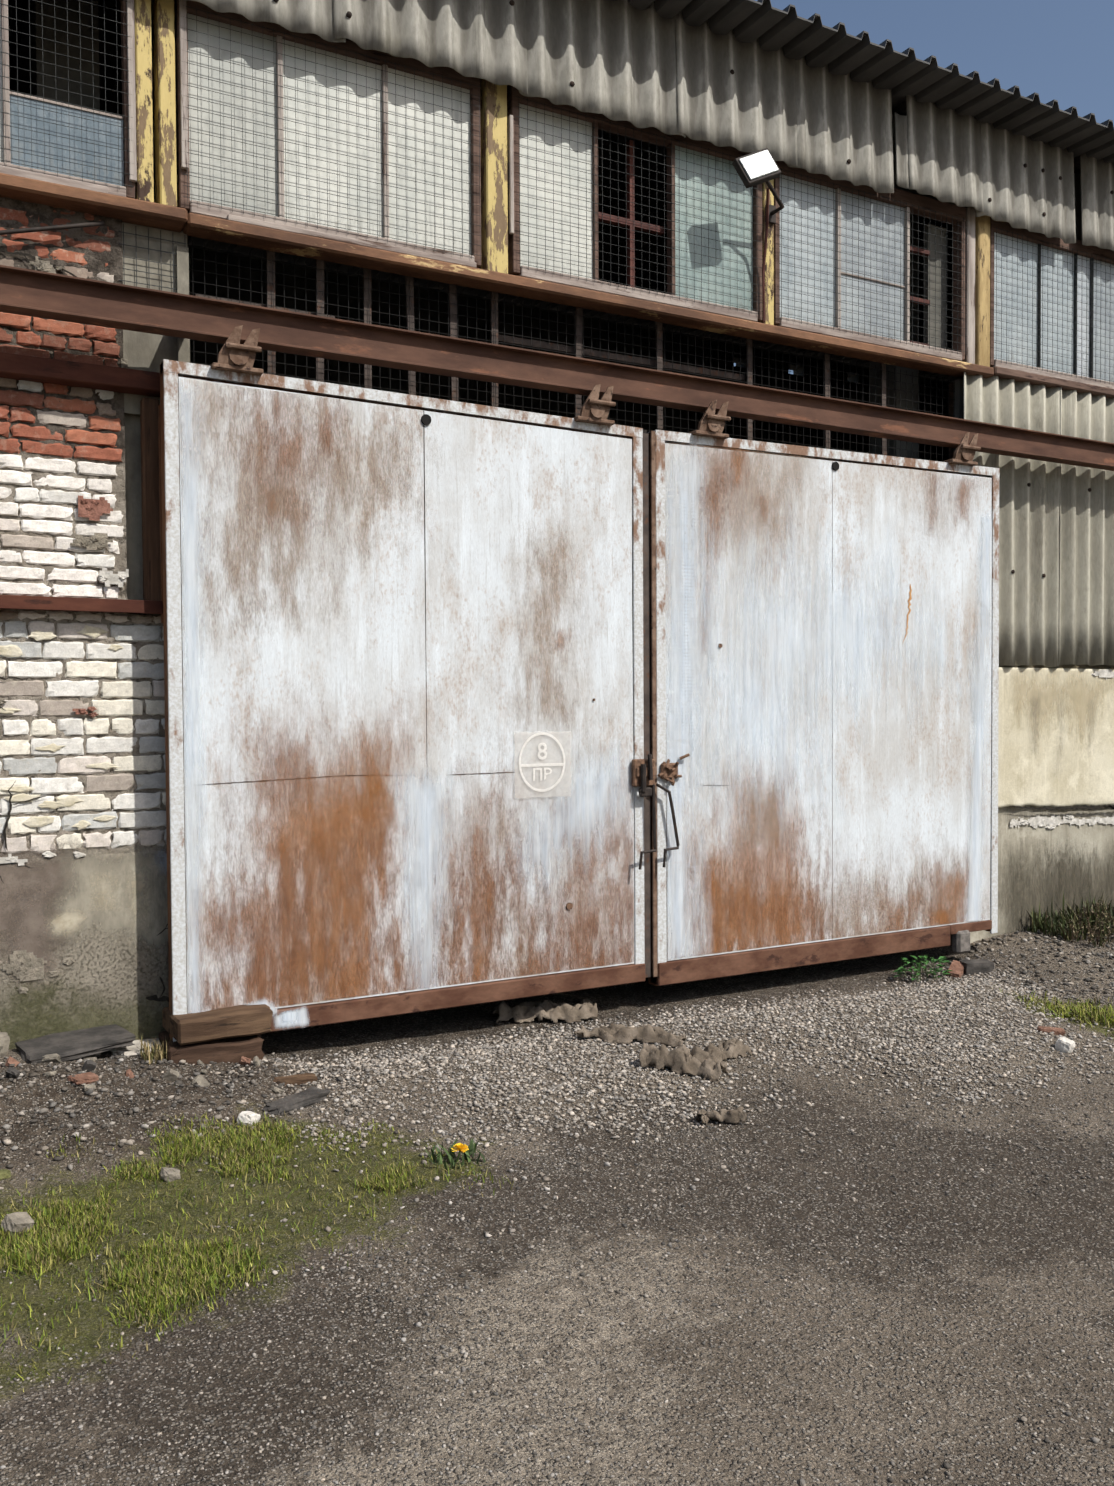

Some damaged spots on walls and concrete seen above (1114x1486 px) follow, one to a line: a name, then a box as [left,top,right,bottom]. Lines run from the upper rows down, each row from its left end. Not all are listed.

spalling [30,256,64,274]
spalling [70,495,113,550]
spalling [98,568,129,587]
peeling [0,630,57,657]
peeling [77,625,123,651]
peeling [0,699,21,714]
spalling [72,706,99,718]
peeling [1,786,116,830]
crack [0,782,45,883]